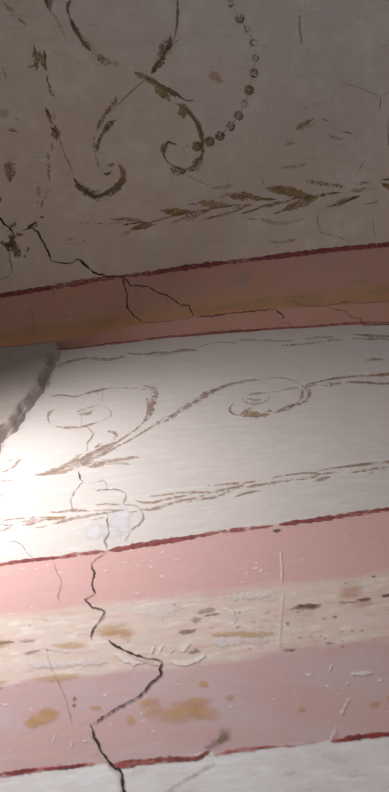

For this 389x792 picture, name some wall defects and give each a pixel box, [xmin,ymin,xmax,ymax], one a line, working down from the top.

crack [0,217,389,326]
crack [70,471,126,510]
crack [84,513,162,792]